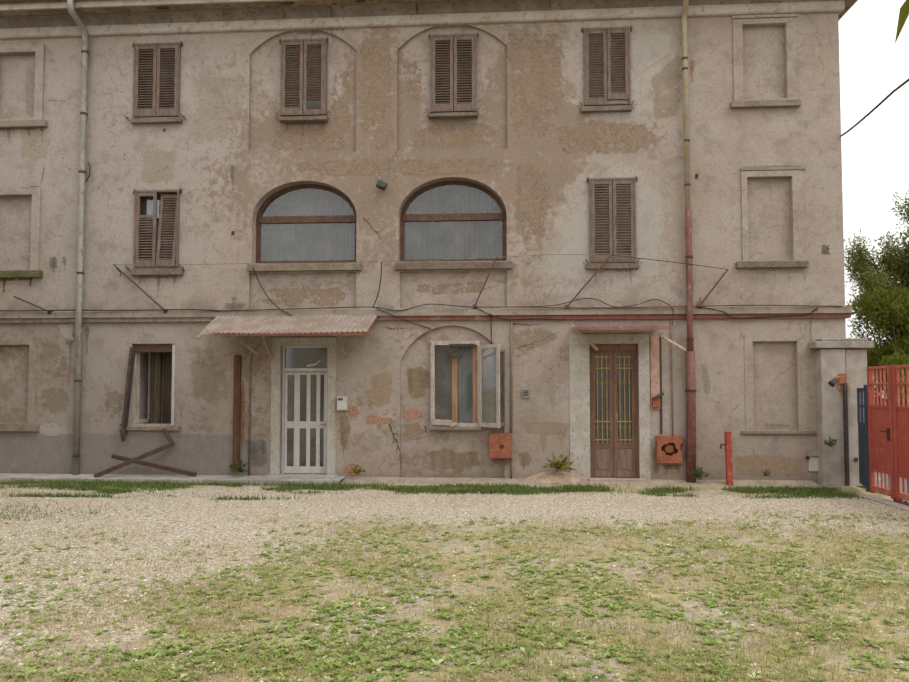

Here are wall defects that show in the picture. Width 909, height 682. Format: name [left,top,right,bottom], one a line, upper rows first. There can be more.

flaking render [557,120,657,154]
flaking render [417,281,491,294]
flaking render [348,373,393,425]